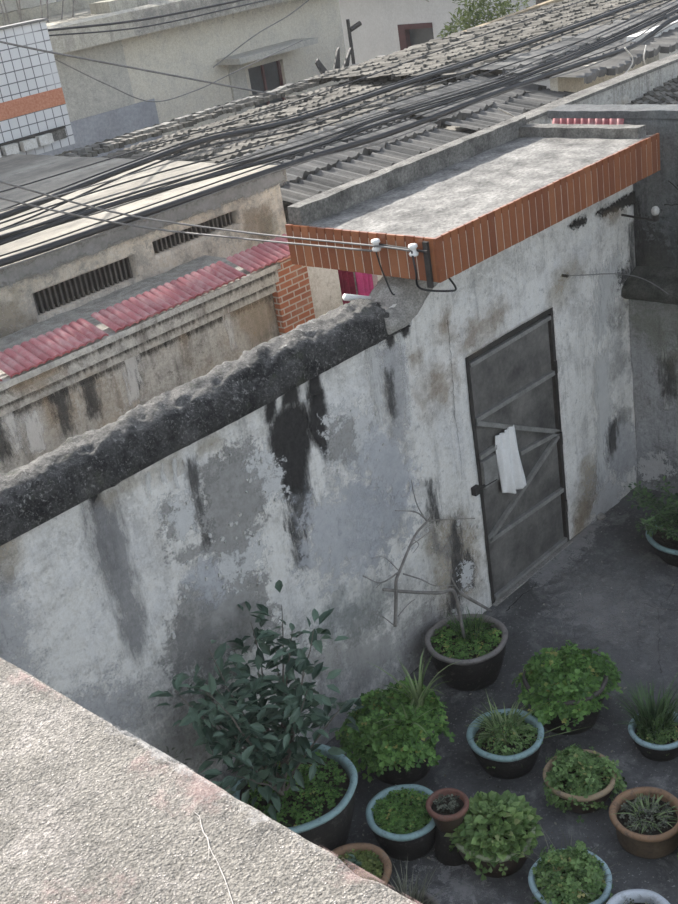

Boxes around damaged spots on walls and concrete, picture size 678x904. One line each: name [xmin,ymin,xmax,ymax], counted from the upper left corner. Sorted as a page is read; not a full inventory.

water stain [0,411,46,463]
water stain [49,387,73,438]
water stain [81,374,102,422]
water stain [123,354,144,405]
water stain [146,458,211,546]
water stain [266,324,422,595]
water stain [593,198,678,491]
water stain [84,493,146,654]
water stain [0,573,49,684]
water stain [71,664,142,733]
water stain [140,739,191,773]
crack [193,811,233,904]